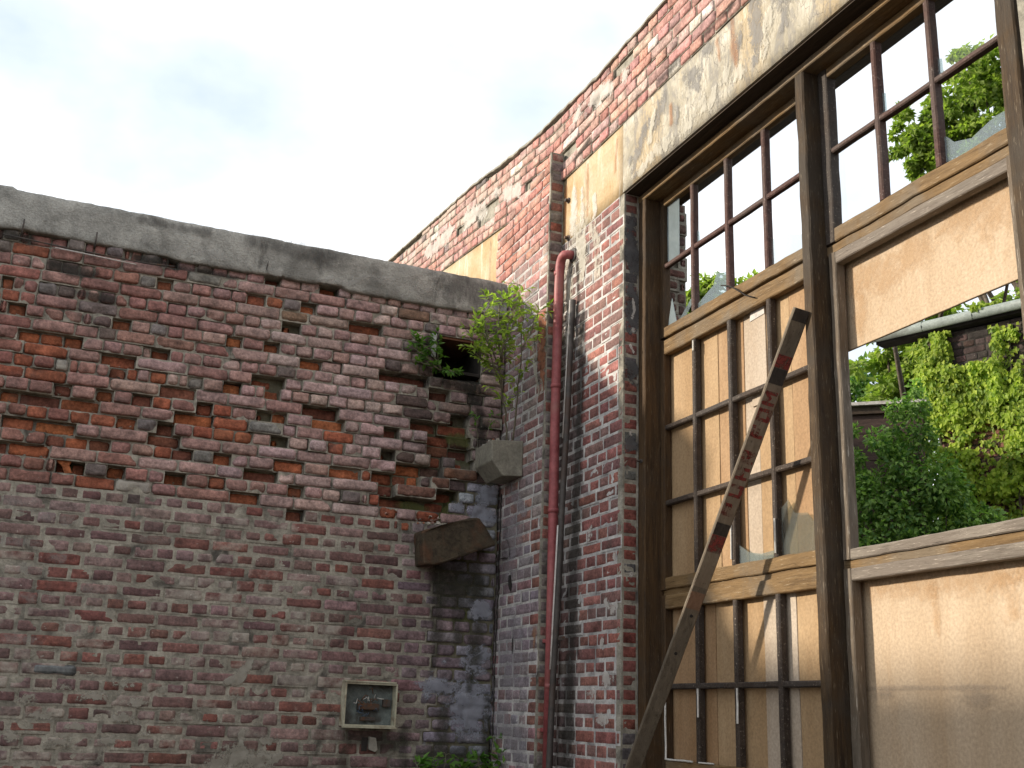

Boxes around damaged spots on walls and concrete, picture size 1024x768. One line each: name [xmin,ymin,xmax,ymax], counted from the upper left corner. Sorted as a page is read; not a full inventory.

spalling [281,325,299,334]
spalling [100,354,136,379]
spalling [0,384,114,414]
spalling [222,378,283,400]
spalling [379,374,447,402]
spalling [131,386,213,461]
spalling [302,407,342,432]
spalling [0,416,111,476]
spalling [270,438,286,448]
spalling [164,474,184,486]
spalling [243,460,303,483]
spalling [329,418,498,524]